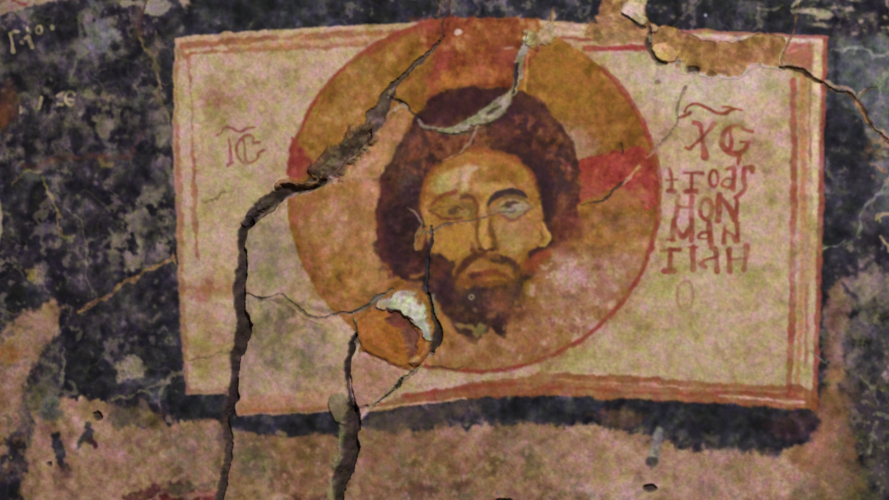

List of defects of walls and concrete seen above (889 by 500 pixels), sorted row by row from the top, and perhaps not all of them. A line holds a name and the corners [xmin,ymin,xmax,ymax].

spalling [580,0,786,86]
crack [752,0,889,146]
crack [110,0,561,500]
crack [821,174,889,251]
flaking render [355,288,434,372]